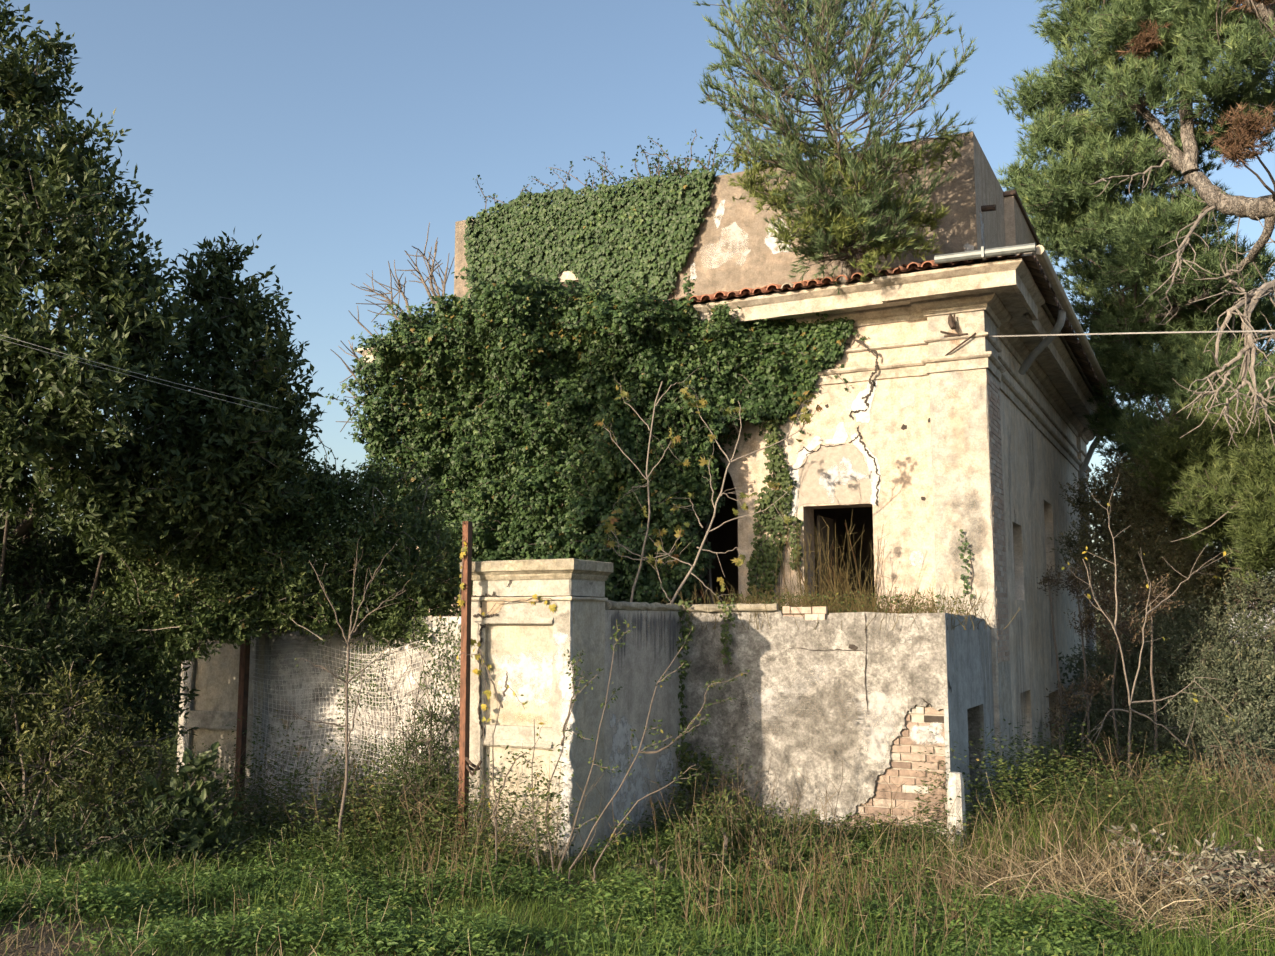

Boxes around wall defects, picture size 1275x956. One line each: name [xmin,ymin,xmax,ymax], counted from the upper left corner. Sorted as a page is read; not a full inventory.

peeling [712,200,750,267]
peeling [765,219,792,254]
peeling [784,379,881,518]
crack [790,339,881,506]
spalling [841,692,947,844]